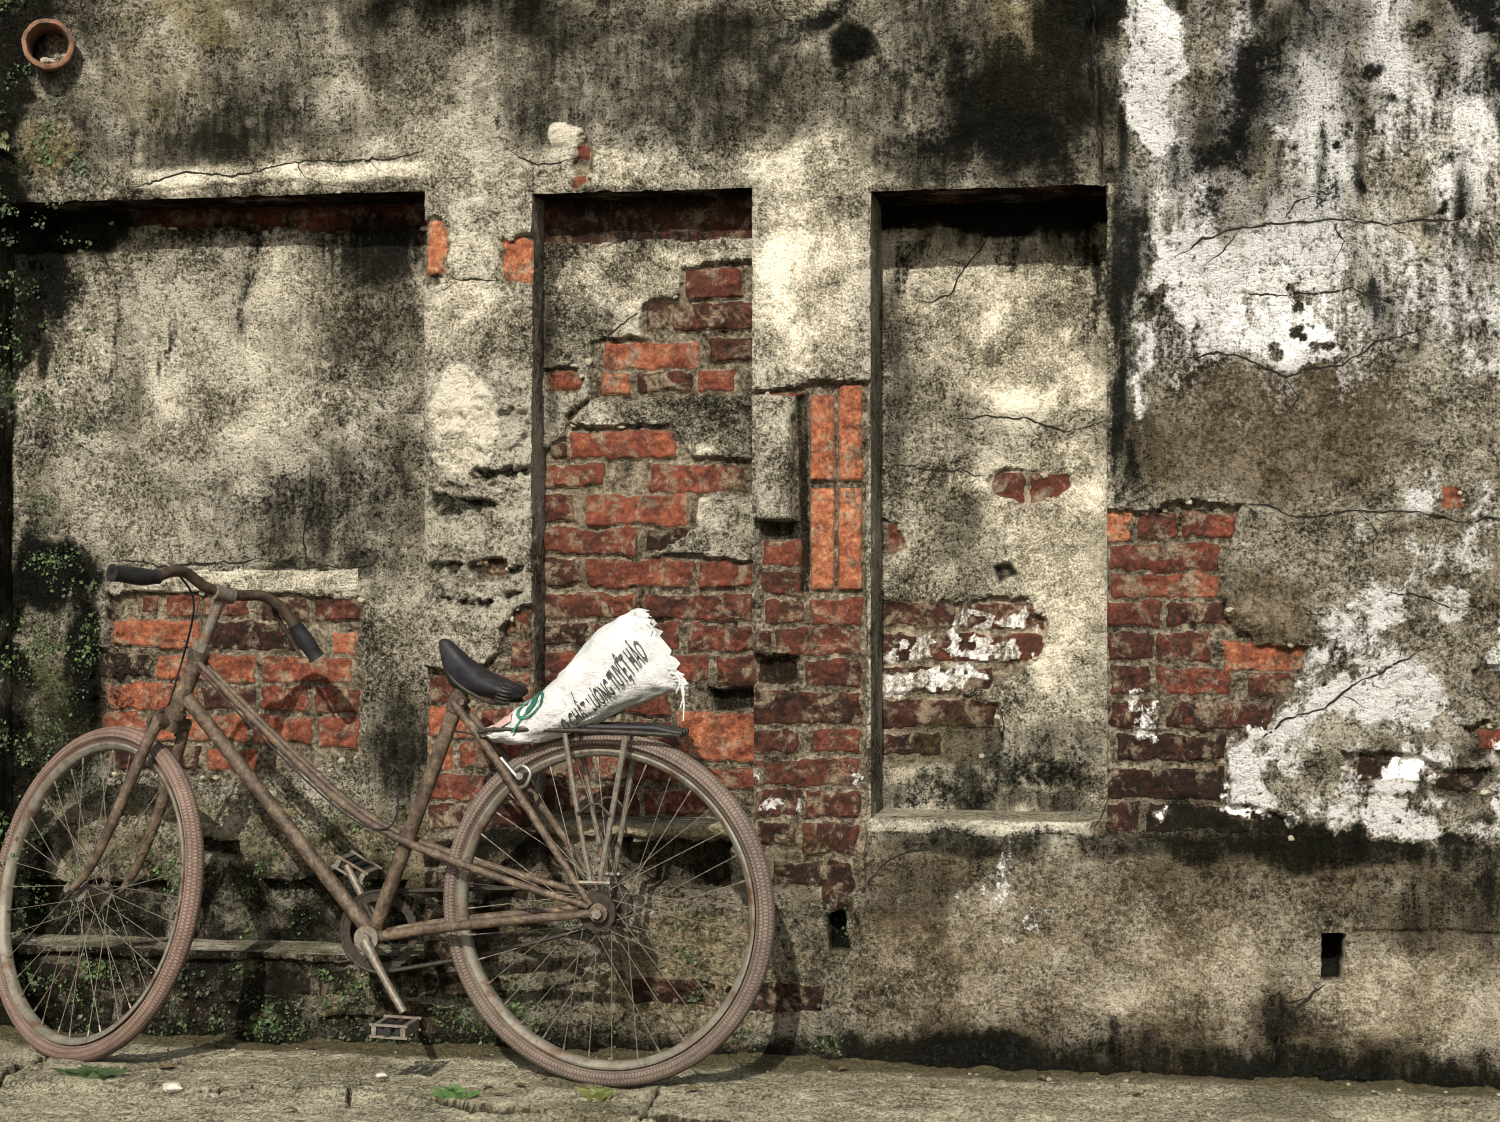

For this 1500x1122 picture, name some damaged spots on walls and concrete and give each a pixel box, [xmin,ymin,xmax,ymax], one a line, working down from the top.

crack [133,151,423,188]
damp [1183,33,1293,228]
damp [1359,61,1411,103]
damp [1429,142,1474,171]
damp [1407,0,1500,102]
damp [883,36,1156,523]
crack [1175,196,1463,416]
spalling [89,590,366,783]
spalling [425,258,1049,897]
spalling [986,464,1072,507]
spalling [1091,465,1500,848]
crack [1239,503,1500,611]